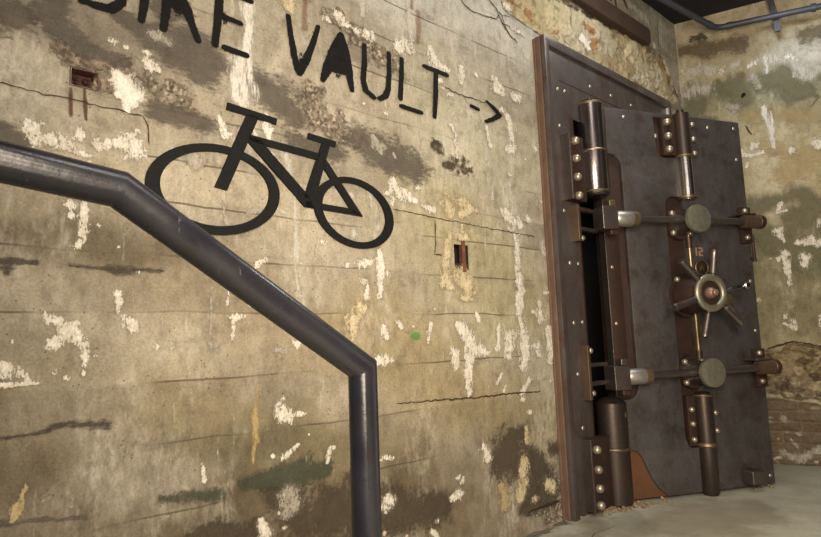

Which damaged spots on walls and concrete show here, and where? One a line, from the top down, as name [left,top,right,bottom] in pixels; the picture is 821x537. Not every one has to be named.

water stain [0,0,129,67]
crack [462,0,525,43]
flaking render [501,0,677,105]
peeling [382,176,479,303]
peeling [769,218,821,286]
peeling [449,206,553,415]
peeling [782,314,798,331]
flaking render [764,342,821,466]
peeling [381,493,396,514]
peeling [478,443,494,463]
water stain [490,422,561,516]
peeling [495,455,563,525]